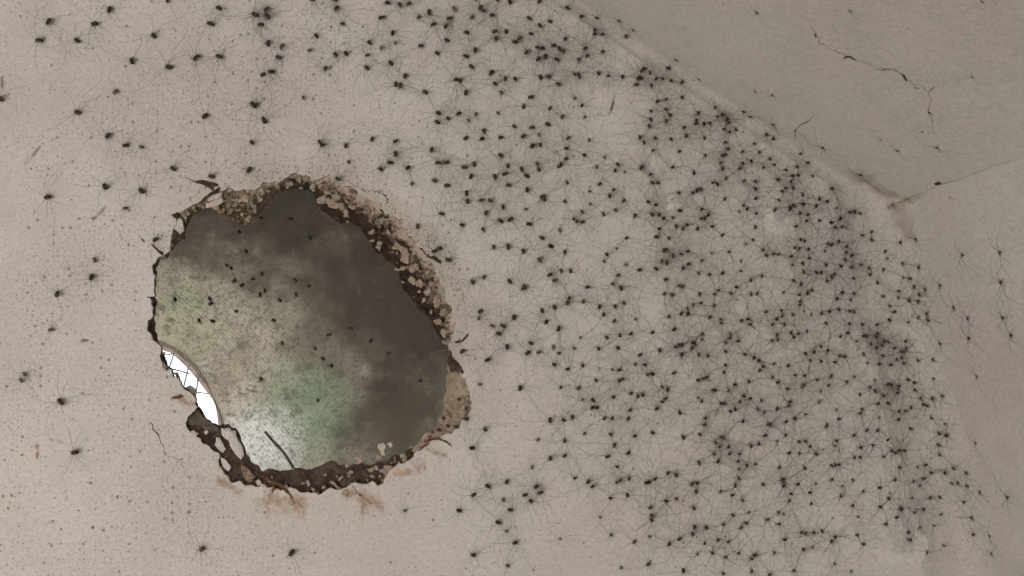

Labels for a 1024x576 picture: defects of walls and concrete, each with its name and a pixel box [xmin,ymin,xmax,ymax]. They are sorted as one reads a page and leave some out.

crack [810,27,934,132]
crack [890,157,1020,206]
flaking render [141,174,472,495]
crack [149,422,184,463]